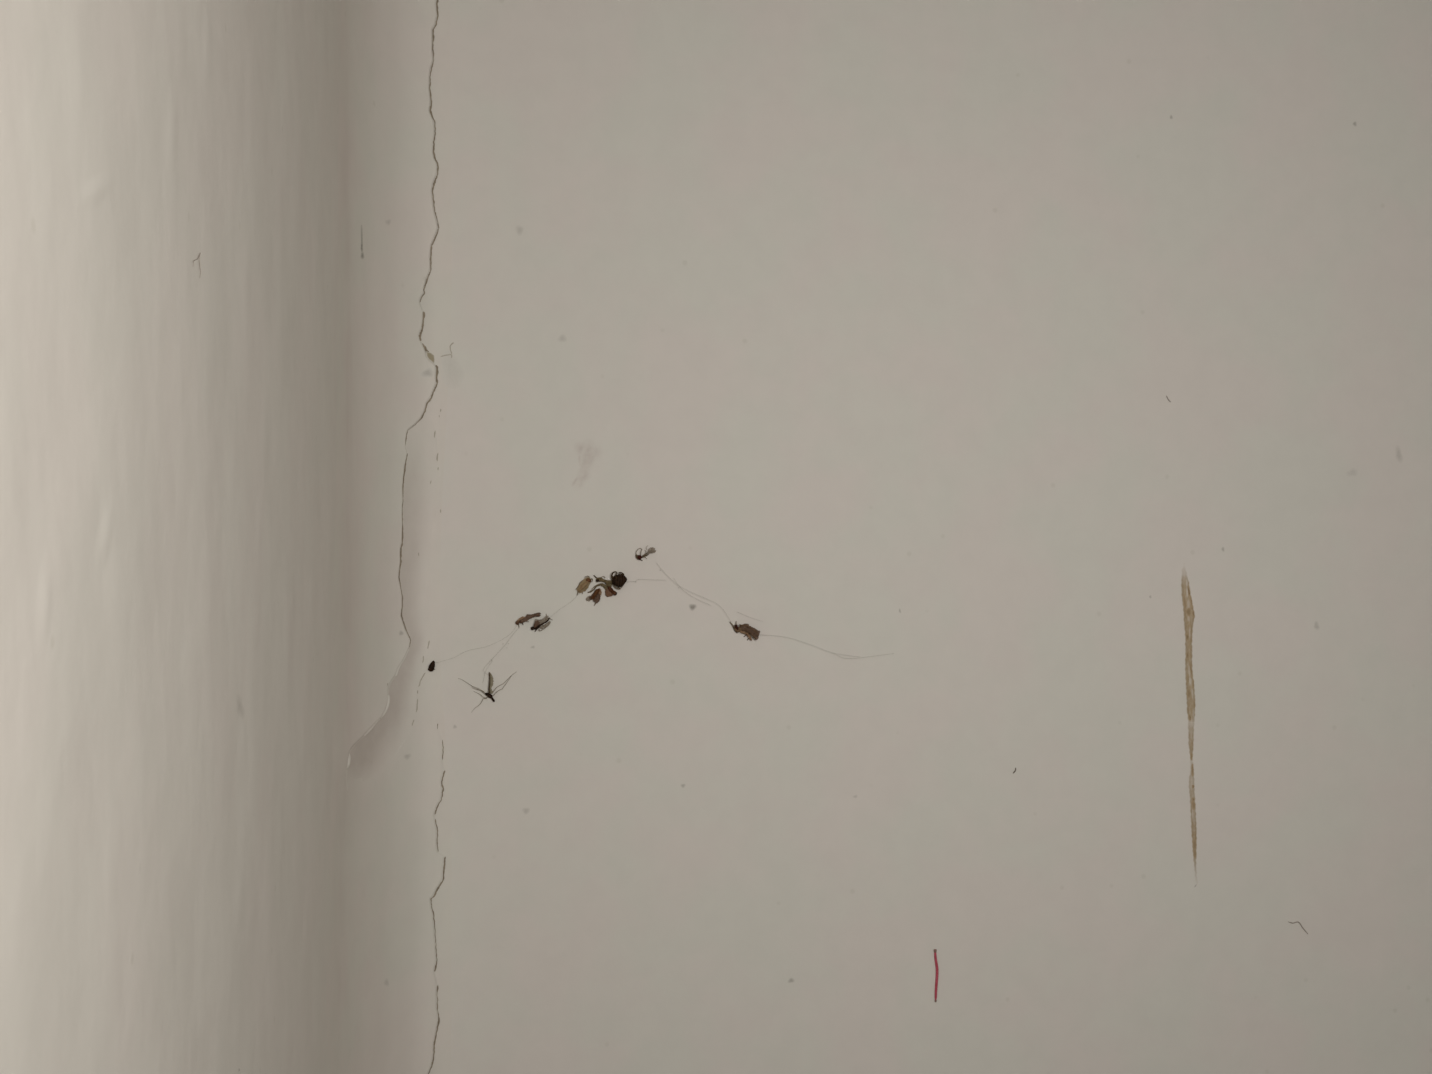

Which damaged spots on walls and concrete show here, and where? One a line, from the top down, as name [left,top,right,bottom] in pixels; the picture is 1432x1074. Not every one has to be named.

crack [398,0,453,1074]